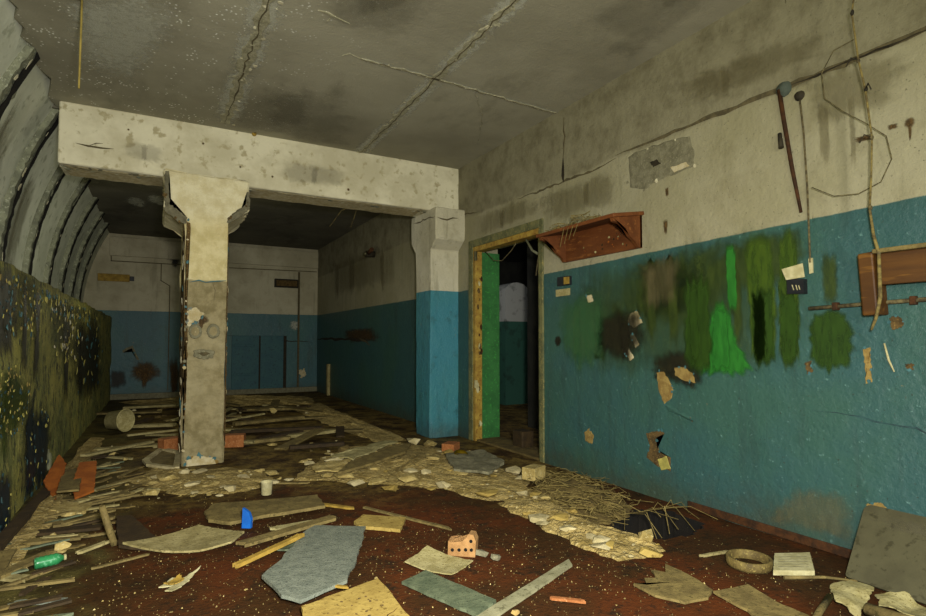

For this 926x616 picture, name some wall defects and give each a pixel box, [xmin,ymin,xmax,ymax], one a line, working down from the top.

crack [216,0,283,126]
crack [342,0,926,199]
spalling [626,136,696,192]
water stain [0,268,40,377]
peeling [624,310,643,361]
peeling [887,314,904,330]
peeling [657,365,696,405]
peeling [863,346,873,384]
peeling [583,429,594,444]
peeling [646,428,671,471]